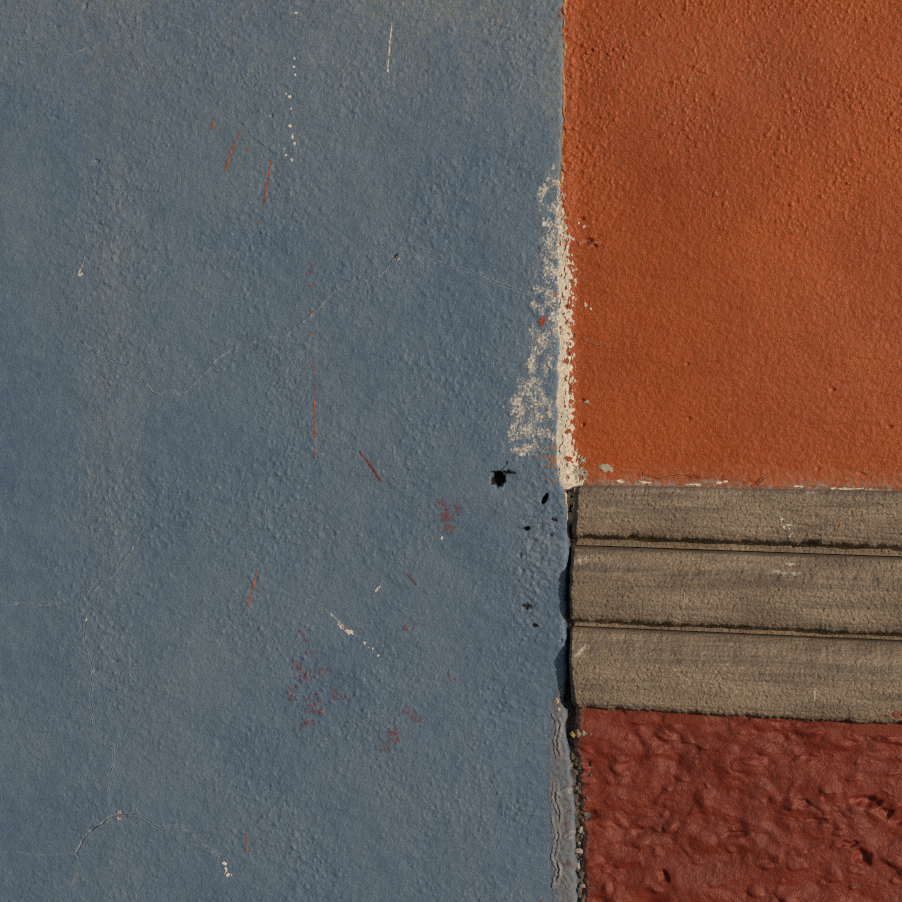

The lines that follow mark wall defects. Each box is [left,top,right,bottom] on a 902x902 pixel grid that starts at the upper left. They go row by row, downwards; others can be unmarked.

crack [65,249,544,533]
hole [491,461,516,487]
crack [0,526,232,898]